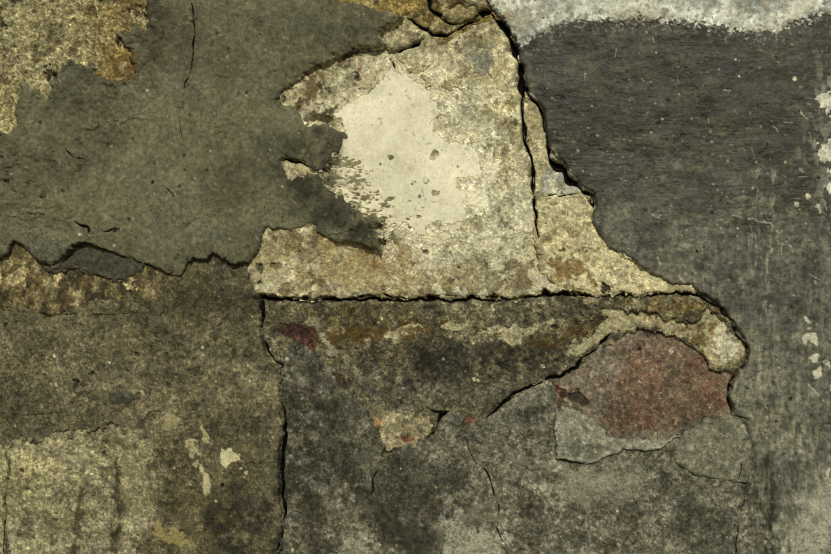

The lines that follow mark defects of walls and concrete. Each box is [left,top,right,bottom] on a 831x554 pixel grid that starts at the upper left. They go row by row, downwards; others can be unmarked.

spalling [0,0,149,134]
crack [177,3,195,165]
crack [383,0,594,235]
spalling [0,242,179,317]
spalling [247,0,748,461]
crack [257,294,498,552]
crack [467,444,506,551]
crack [483,334,611,419]